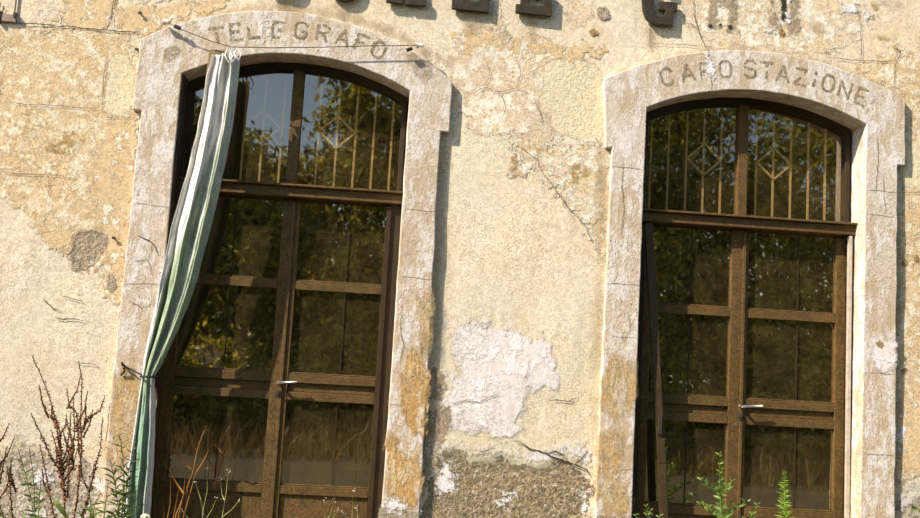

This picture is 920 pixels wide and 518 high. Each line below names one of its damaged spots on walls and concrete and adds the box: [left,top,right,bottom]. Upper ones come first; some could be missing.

peeling [0,0,227,306]
peeling [448,0,610,261]
crack [475,58,594,246]
peeling [854,42,920,146]
peeling [441,317,560,439]
spalling [419,449,595,518]
crack [516,441,591,477]